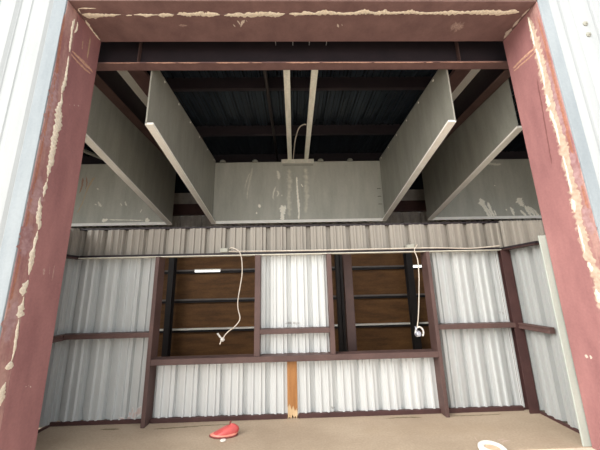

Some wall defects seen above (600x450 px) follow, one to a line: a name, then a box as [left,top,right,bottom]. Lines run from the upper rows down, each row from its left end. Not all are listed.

peeling [5,8,600,370]